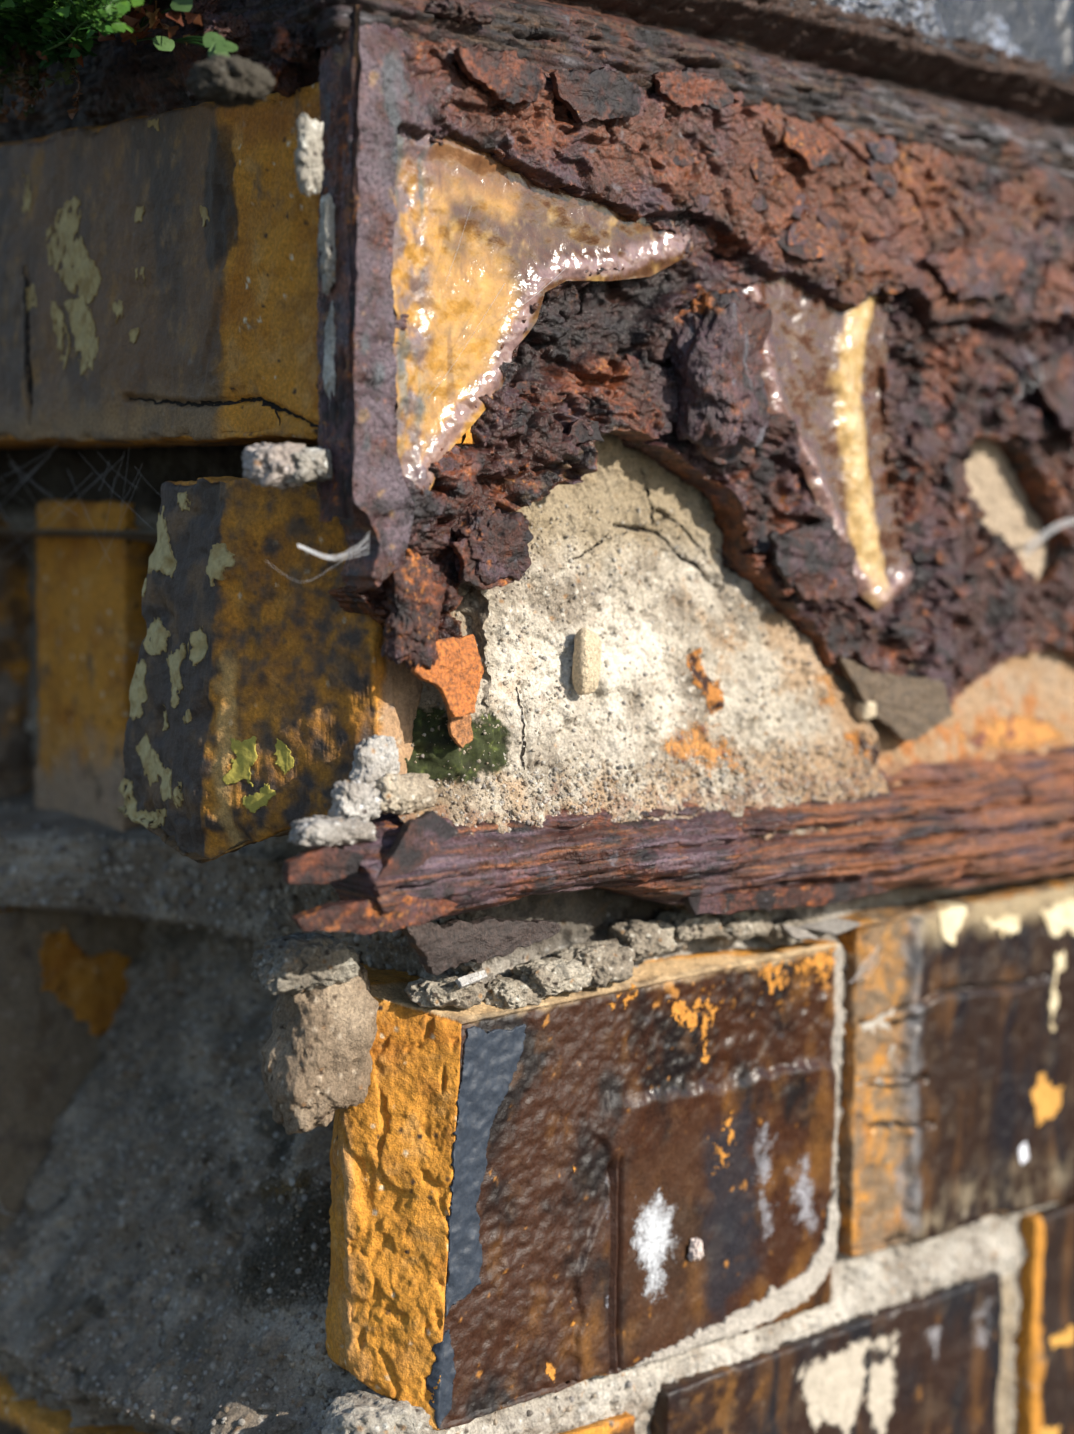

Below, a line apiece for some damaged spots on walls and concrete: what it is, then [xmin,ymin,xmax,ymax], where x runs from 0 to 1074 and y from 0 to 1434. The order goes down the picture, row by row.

spalling [810,0,951,43]
spalling [972,14,1029,60]
corrosion [453,43,745,124]
corrosion [782,126,838,171]
peeling [25,196,102,376]
corrosion [881,245,1026,302]
corrosion [994,353,1074,444]
crack [566,470,714,587]
corrosion [745,520,859,603]
corrosion [411,634,484,748]
spalling [761,917,861,994]
spalling [668,998,724,1063]